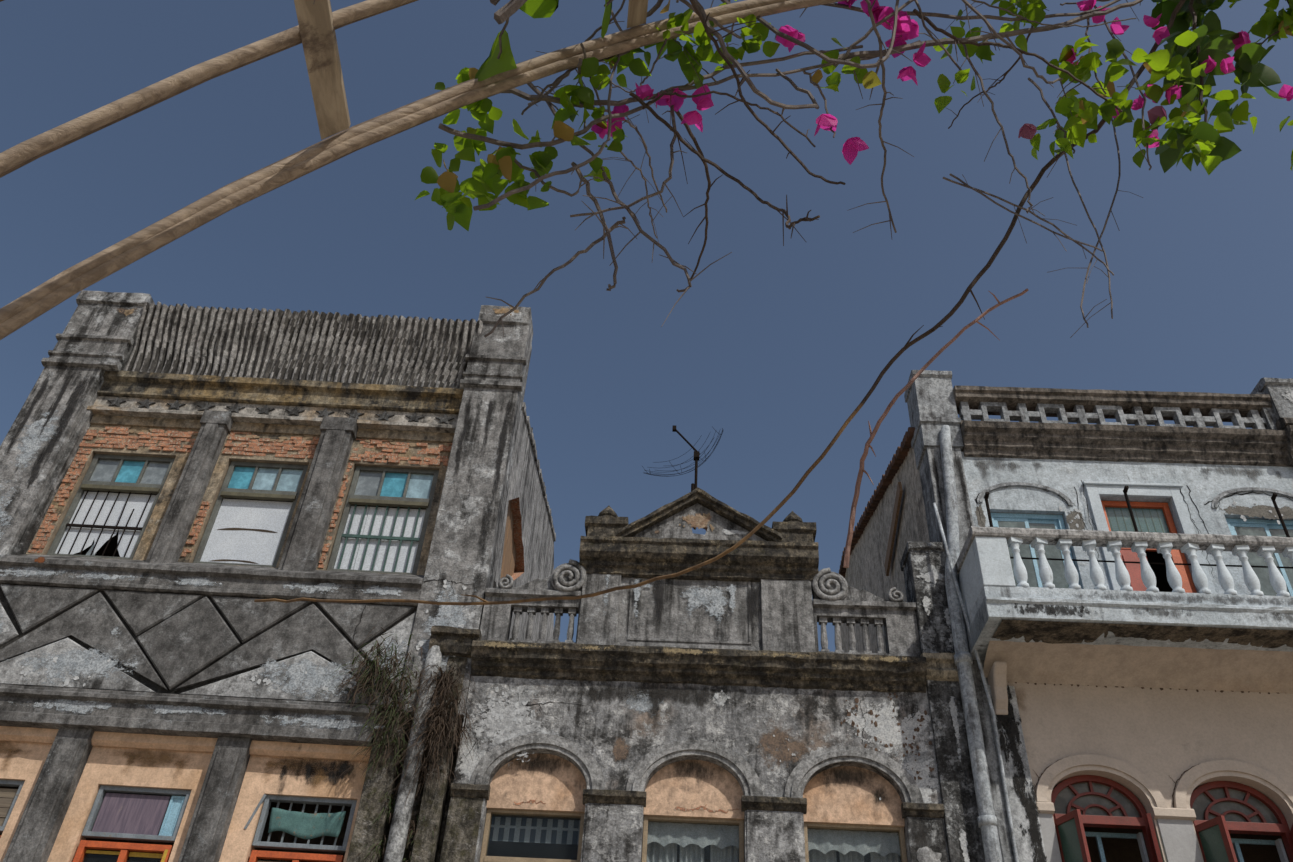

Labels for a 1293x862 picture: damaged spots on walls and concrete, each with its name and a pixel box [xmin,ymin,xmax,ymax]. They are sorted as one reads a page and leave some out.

damp [7,374,88,489]
damp [454,402,471,473]
damp [481,396,511,546]
damp [998,592,1293,621]
damp [558,682,769,720]
damp [268,758,354,791]
damp [515,754,564,772]
damp [675,761,721,778]
damp [823,766,885,802]
damp [992,686,1047,862]